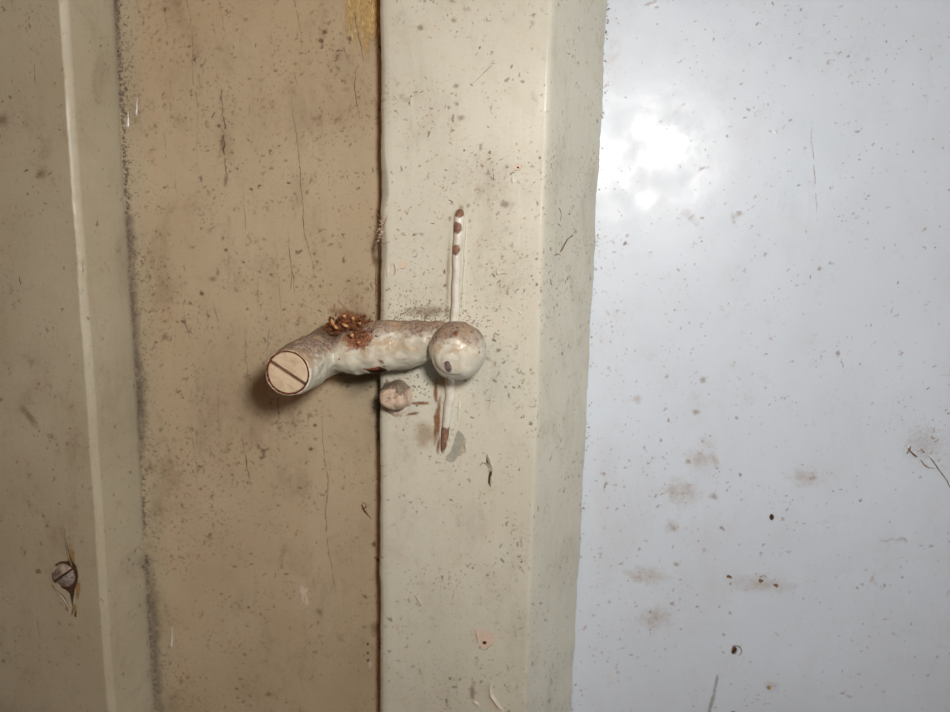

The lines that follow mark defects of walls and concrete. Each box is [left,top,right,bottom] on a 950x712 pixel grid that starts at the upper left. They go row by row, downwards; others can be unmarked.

crack [221,93,247,247]
peeling [446,431,467,462]